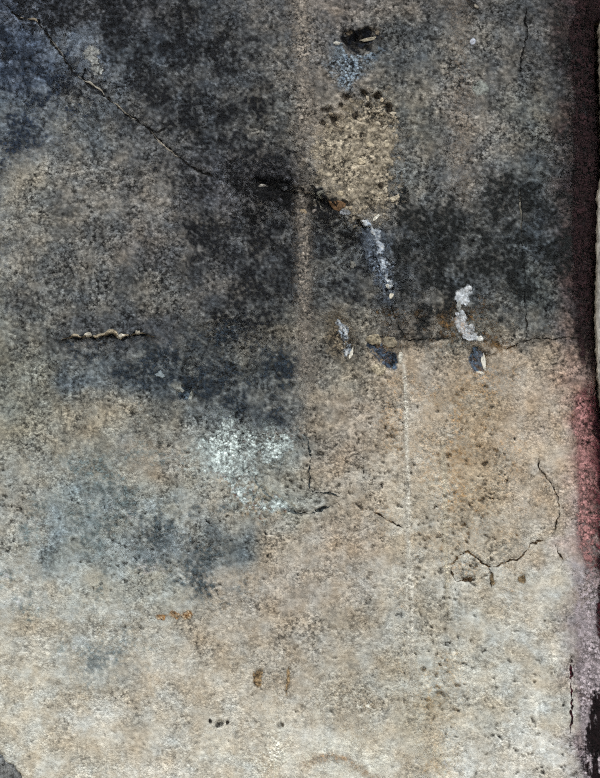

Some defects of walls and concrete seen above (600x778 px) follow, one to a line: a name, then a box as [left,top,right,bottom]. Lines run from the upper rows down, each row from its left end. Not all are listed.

crack [61,329,154,341]
crack [2,1,227,183]
leakage [0,0,595,513]
spalling [310,89,400,299]
leakage [403,370,414,667]
crack [451,458,563,587]